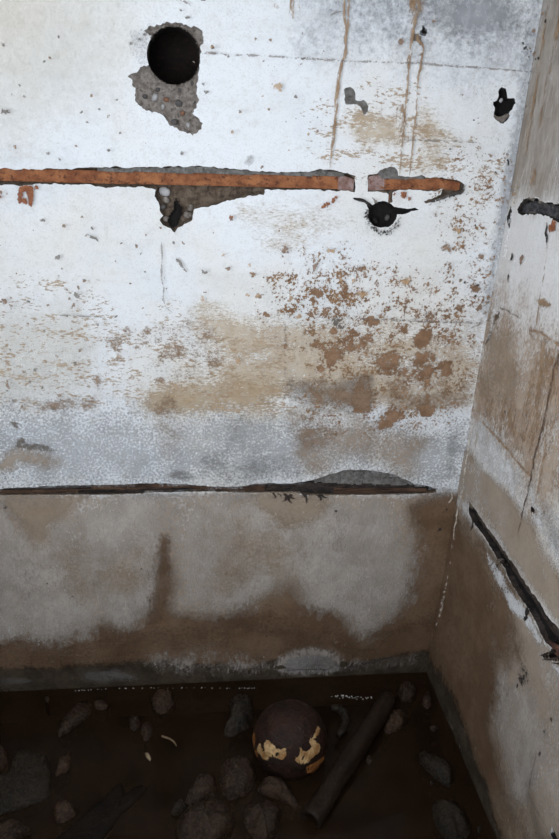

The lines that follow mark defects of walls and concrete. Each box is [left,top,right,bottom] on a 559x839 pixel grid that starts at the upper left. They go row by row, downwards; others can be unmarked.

spalling [128,0,227,136]
corrosion [330,0,350,167]
corrosion [396,0,424,175]
hole [493,88,513,123]
crack [505,206,513,228]
peeling [0,138,559,584]
crack [358,306,559,531]
leakage [0,297,559,839]
peeling [474,508,559,675]